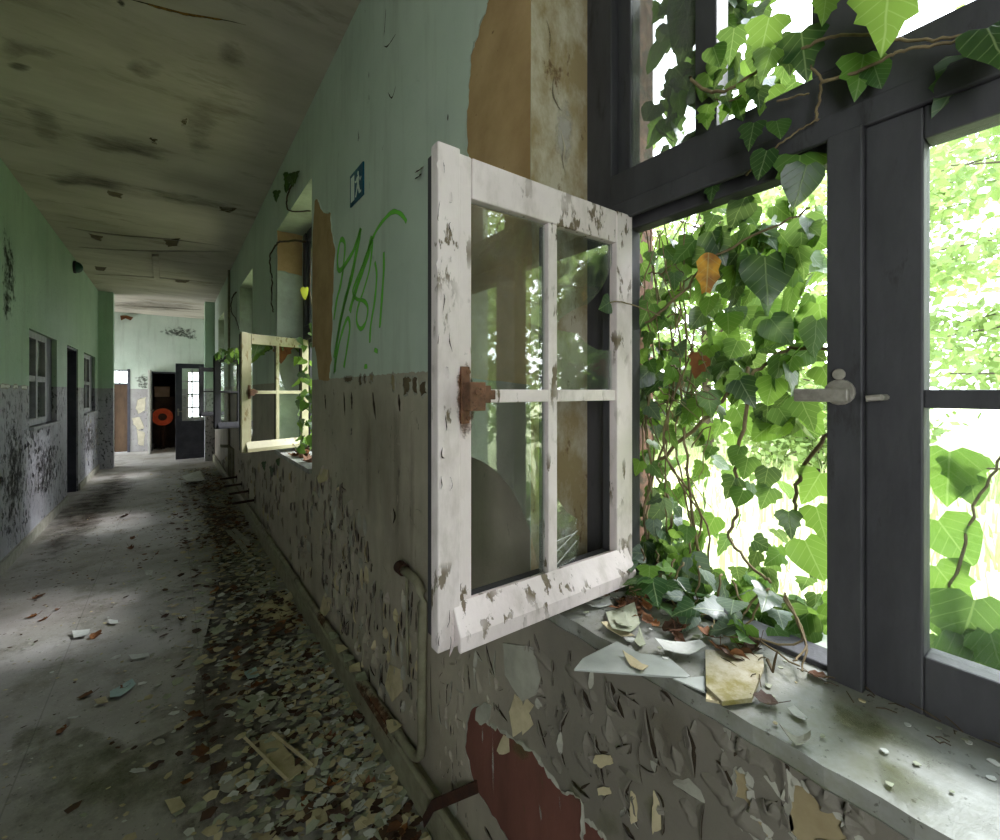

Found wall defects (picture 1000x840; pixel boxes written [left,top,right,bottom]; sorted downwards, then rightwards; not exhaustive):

peeling [466,0,587,200]
peeling [277,198,336,381]
damp [4,430,57,528]
rust [457,366,474,437]
peeling [531,402,539,570]
peeling [557,229,587,562]
peeling [231,571,294,680]
peeling [297,465,418,733]
peeling [440,640,607,840]
peeling [588,753,613,801]